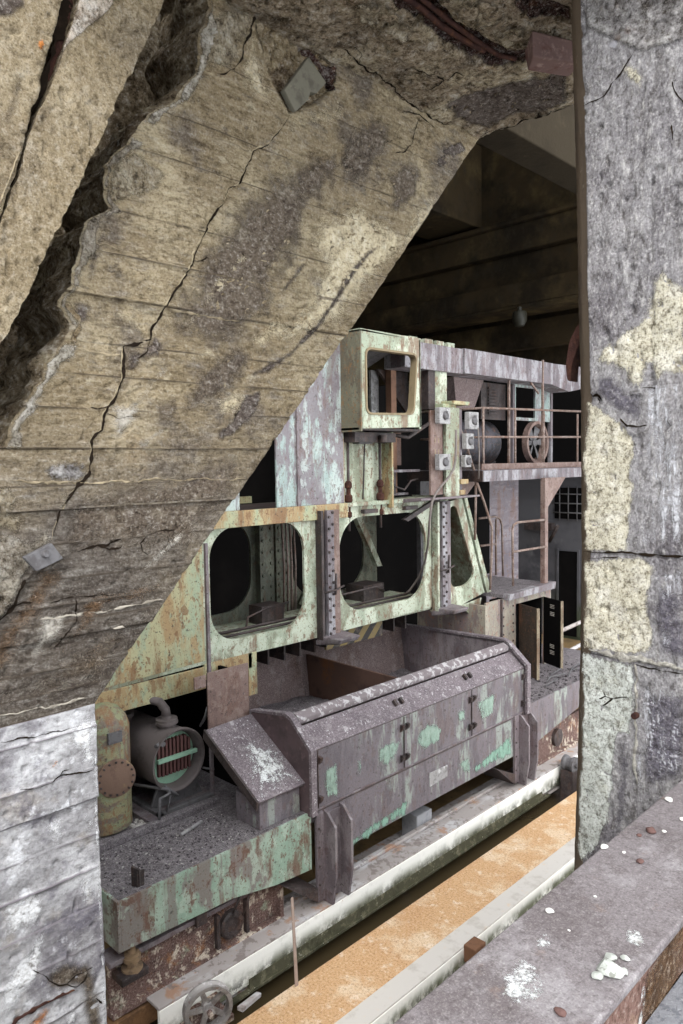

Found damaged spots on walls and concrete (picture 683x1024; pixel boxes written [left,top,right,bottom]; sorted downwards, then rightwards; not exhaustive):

spalling [62,0,113,54]
crack [218,16,264,75]
spalling [356,0,571,67]
crack [484,49,636,135]
spalling [8,139,163,447]
crack [51,117,289,541]
crack [0,580,116,648]